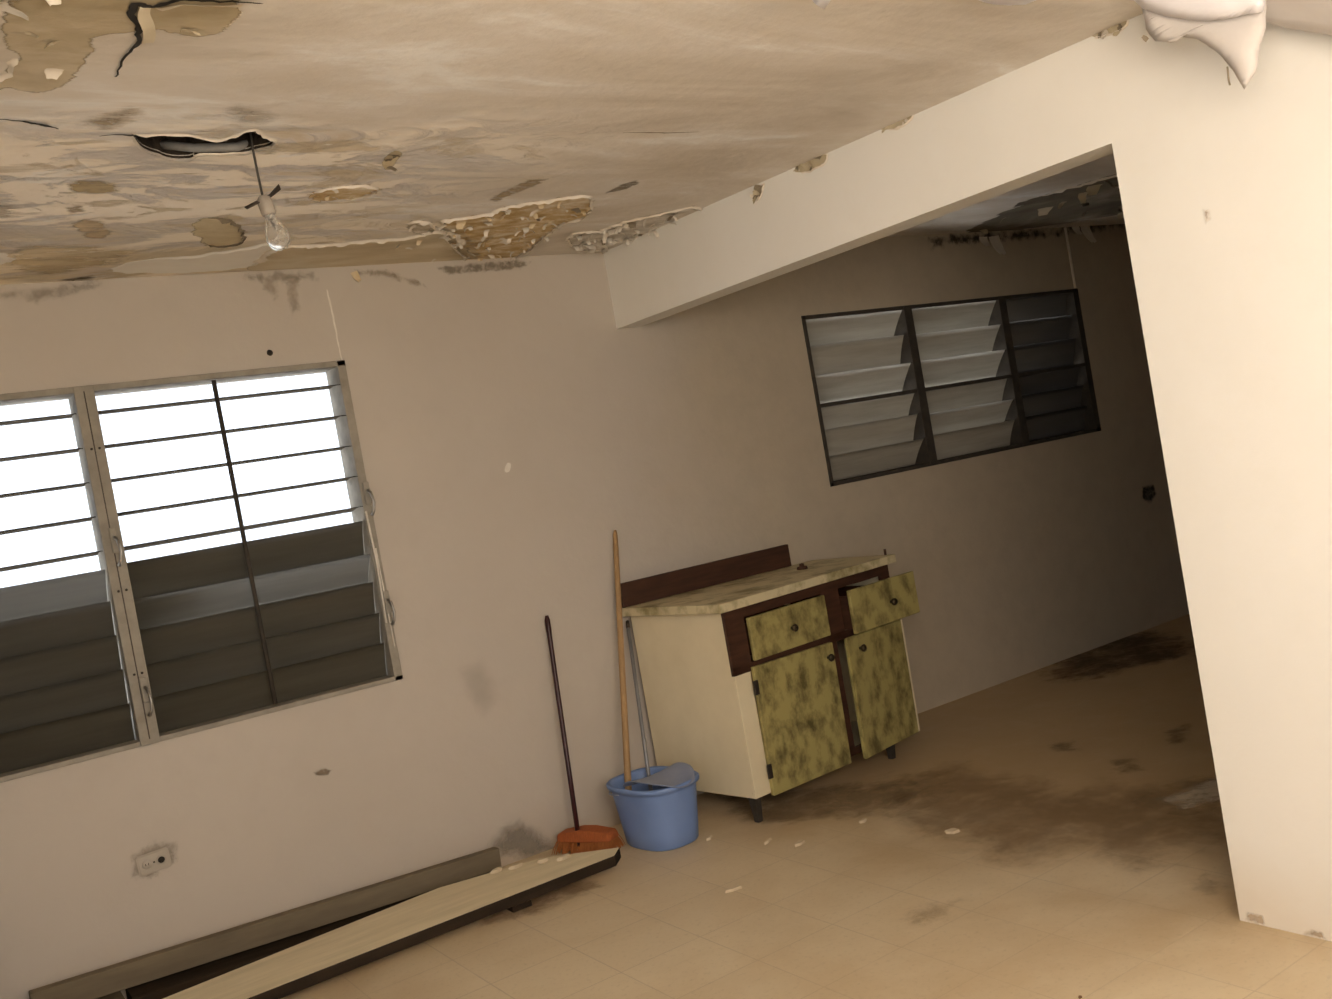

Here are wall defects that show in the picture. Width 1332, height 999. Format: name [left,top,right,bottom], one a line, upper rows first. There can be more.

peeling [0,0,241,93]
crack [115,0,263,77]
spalling [129,129,279,162]
peeling [382,151,402,171]
peeling [192,218,247,248]
peeling [308,184,382,202]
peeling [247,195,703,282]
peeling [967,174,1124,255]
water stain [1055,633,1187,678]
water stain [1168,780,1220,806]